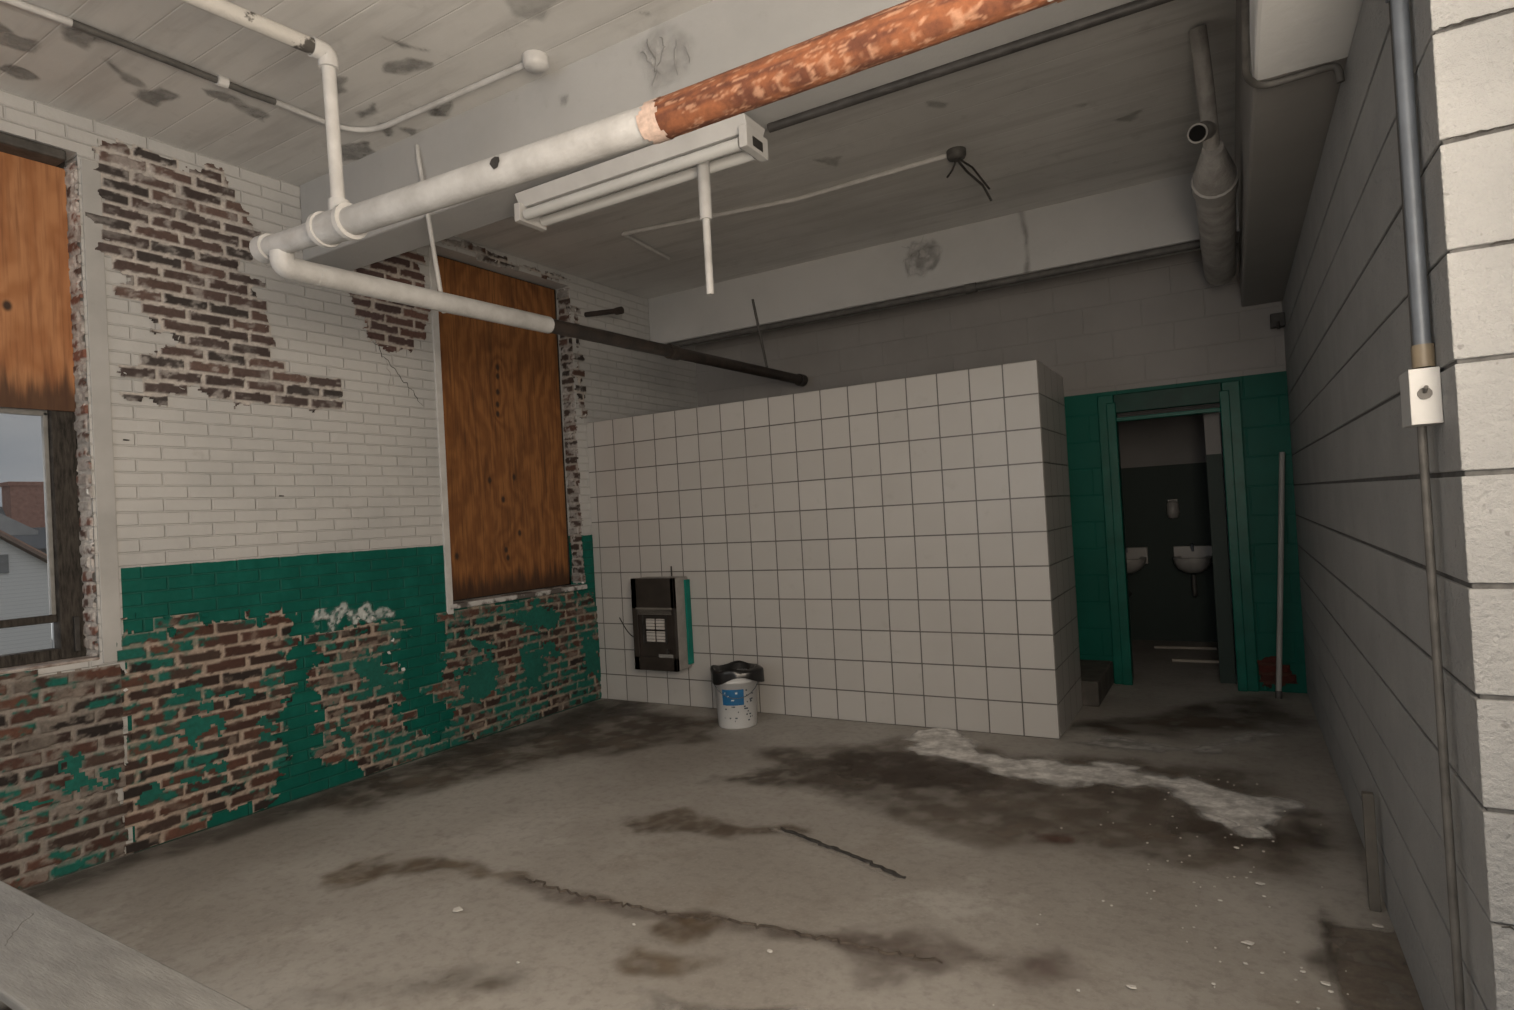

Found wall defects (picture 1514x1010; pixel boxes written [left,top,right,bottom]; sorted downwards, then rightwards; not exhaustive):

rust [654,0,1059,139]
spalling [0,138,602,890]
damp [729,701,1318,868]